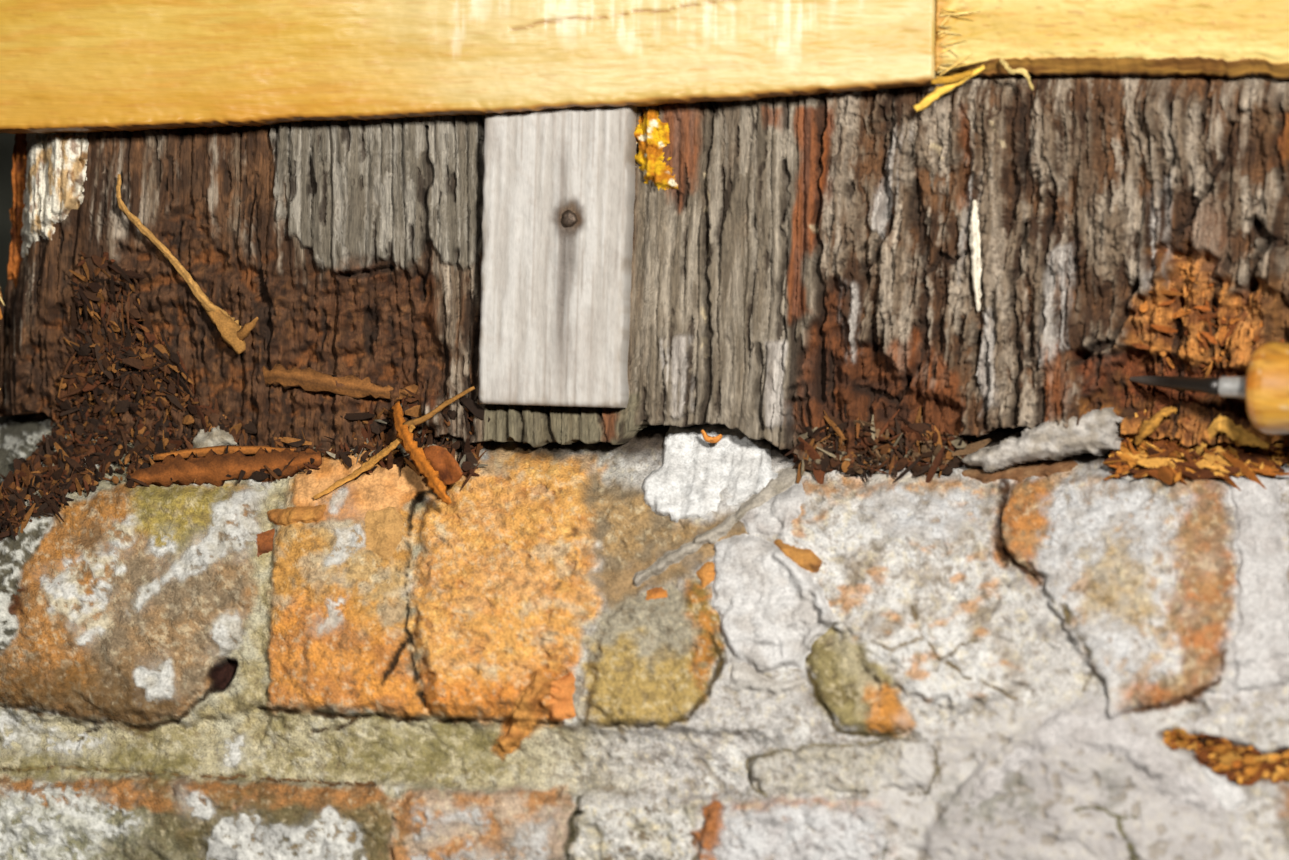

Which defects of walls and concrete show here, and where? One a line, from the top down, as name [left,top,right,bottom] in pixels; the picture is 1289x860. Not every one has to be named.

crack [258,490,504,733]
crack [537,719,564,727]
crack [602,632,725,728]
crack [1075,806,1137,860]